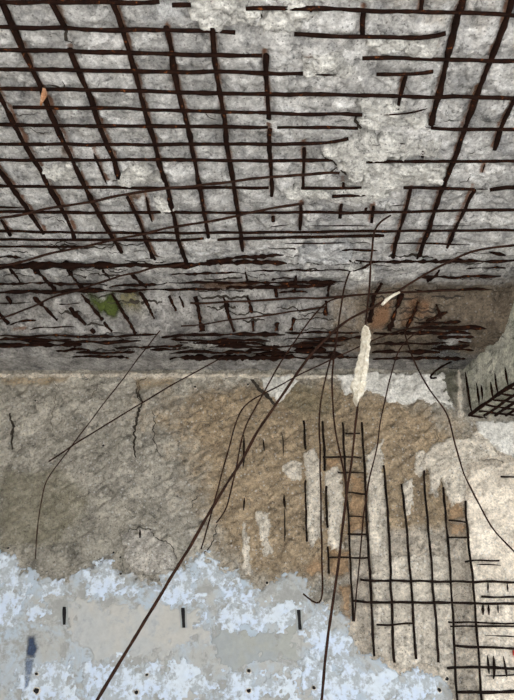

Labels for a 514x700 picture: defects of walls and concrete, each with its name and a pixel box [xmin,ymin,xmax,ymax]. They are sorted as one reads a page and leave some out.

spalling [187,0,320,34]
spalling [301,51,356,80]
spalling [365,31,442,63]
spalling [0,89,449,267]
rust [371,304,389,327]
crack [8,413,16,450]
crack [132,378,161,458]
peeling [0,215,514,700]